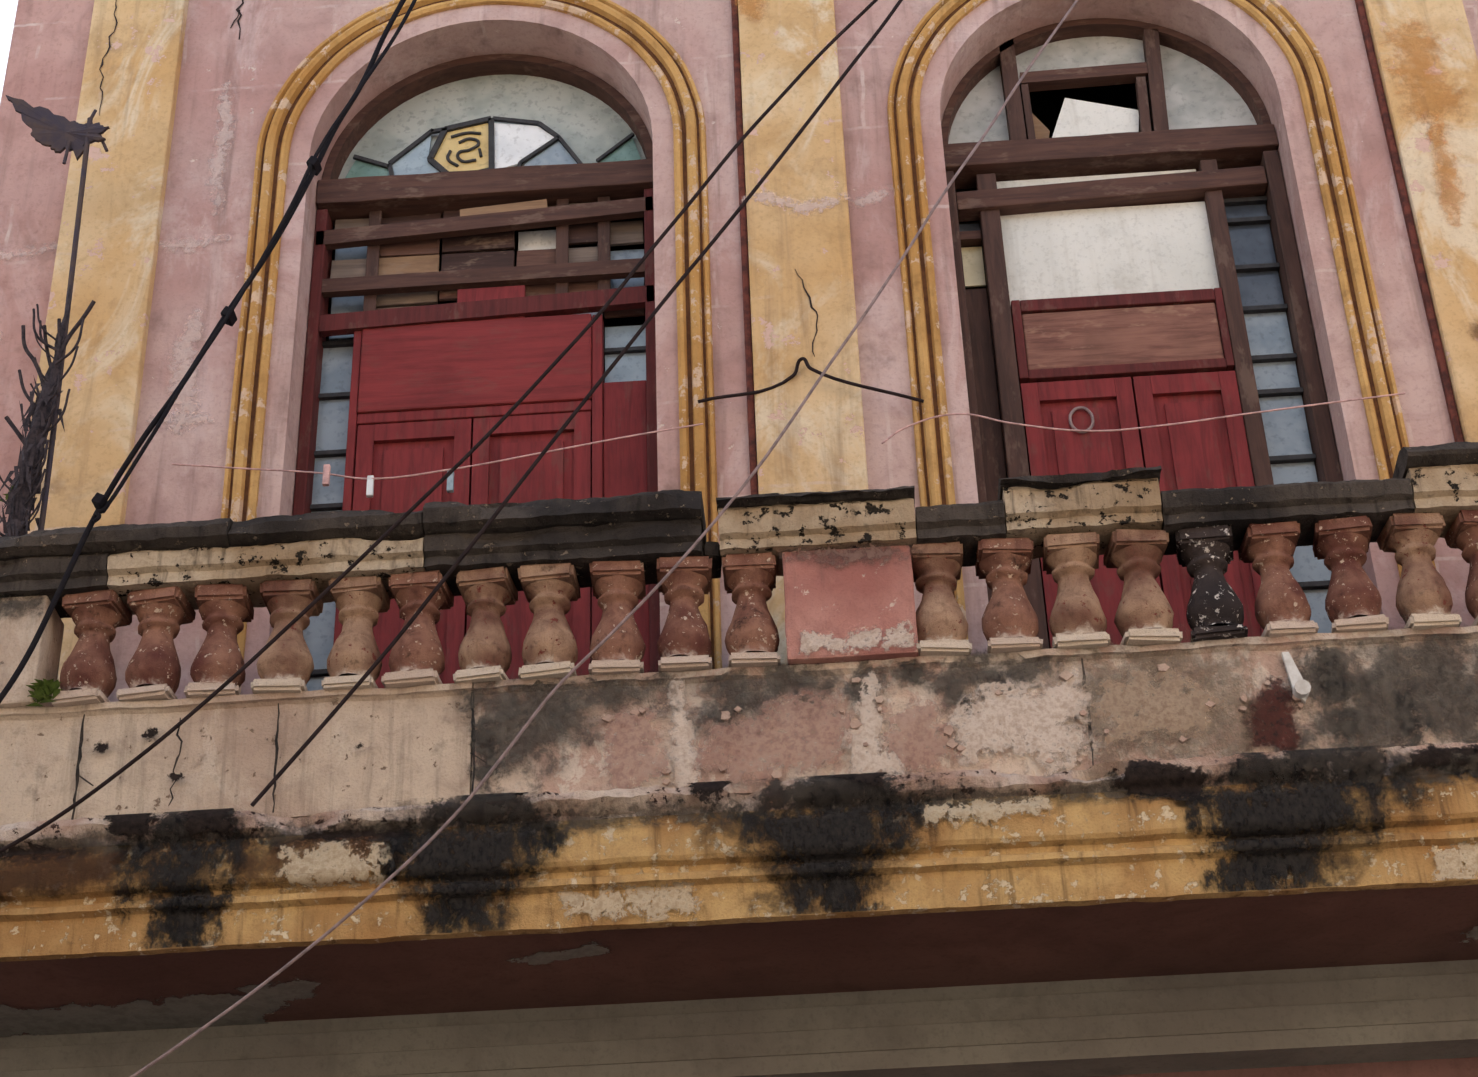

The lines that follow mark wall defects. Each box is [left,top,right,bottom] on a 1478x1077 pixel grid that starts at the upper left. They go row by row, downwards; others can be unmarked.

crack [99,0,118,116]
crack [230,0,244,40]
crack [795,269,818,357]
crack [71,714,94,820]
flaking render [600,707,672,789]
leakage [0,634,1478,949]
peeling [923,795,1052,827]
peeling [688,658,1304,804]
peeling [276,825,431,892]
peeling [1431,841,1478,881]
peeling [507,941,610,966]